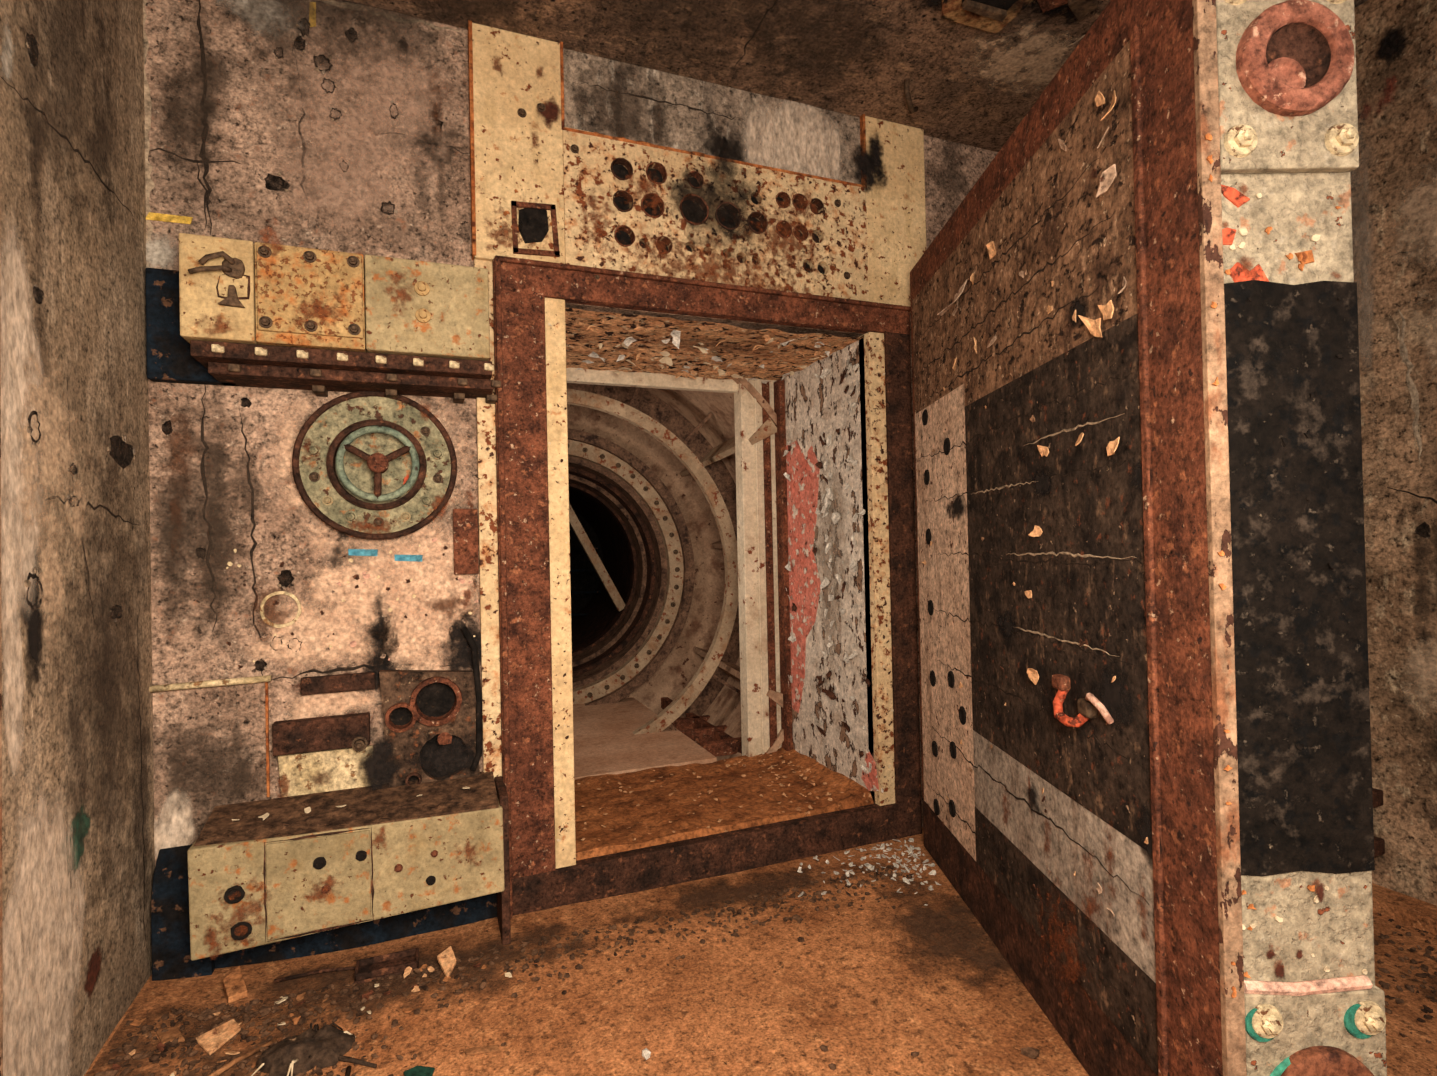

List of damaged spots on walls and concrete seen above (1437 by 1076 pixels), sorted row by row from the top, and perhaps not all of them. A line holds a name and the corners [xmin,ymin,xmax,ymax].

spalling [2,30,39,77]
crack [317,0,466,34]
crack [0,0,241,268]
crack [292,45,310,230]
rust [468,19,476,260]
rust [533,42,866,188]
damp [711,101,840,180]
damp [869,135,884,174]
rust [499,189,560,259]
spalling [33,285,45,304]
peeling [574,323,880,733]
peeling [650,753,844,814]